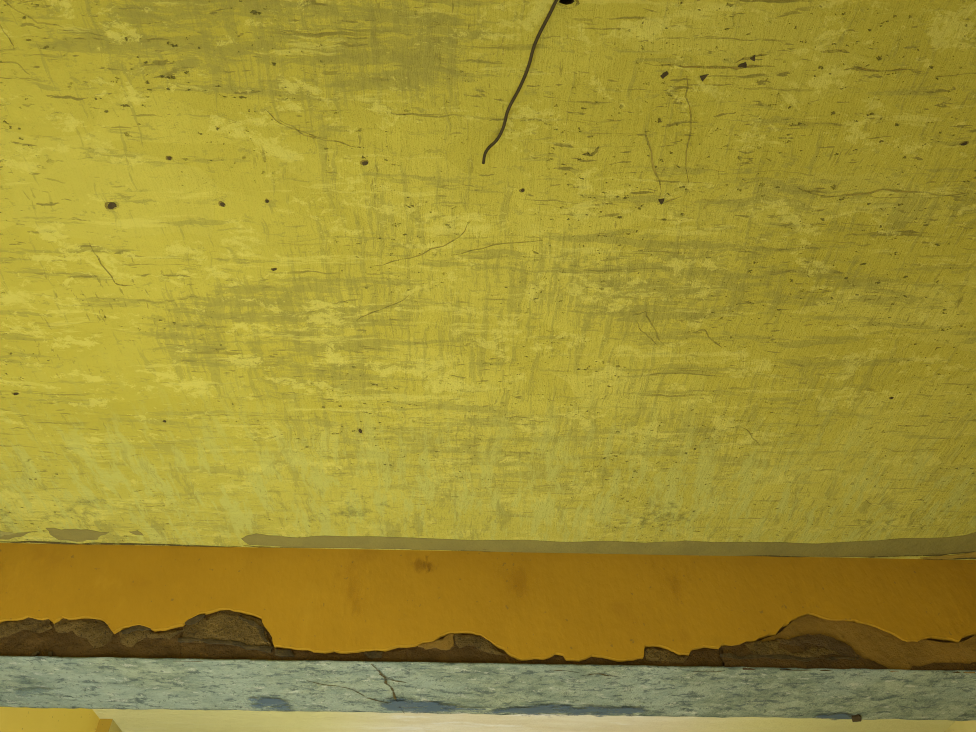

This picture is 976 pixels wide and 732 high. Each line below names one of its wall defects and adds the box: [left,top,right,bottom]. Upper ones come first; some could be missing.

peeling [241,532,976,559]
spalling [0,610,976,673]